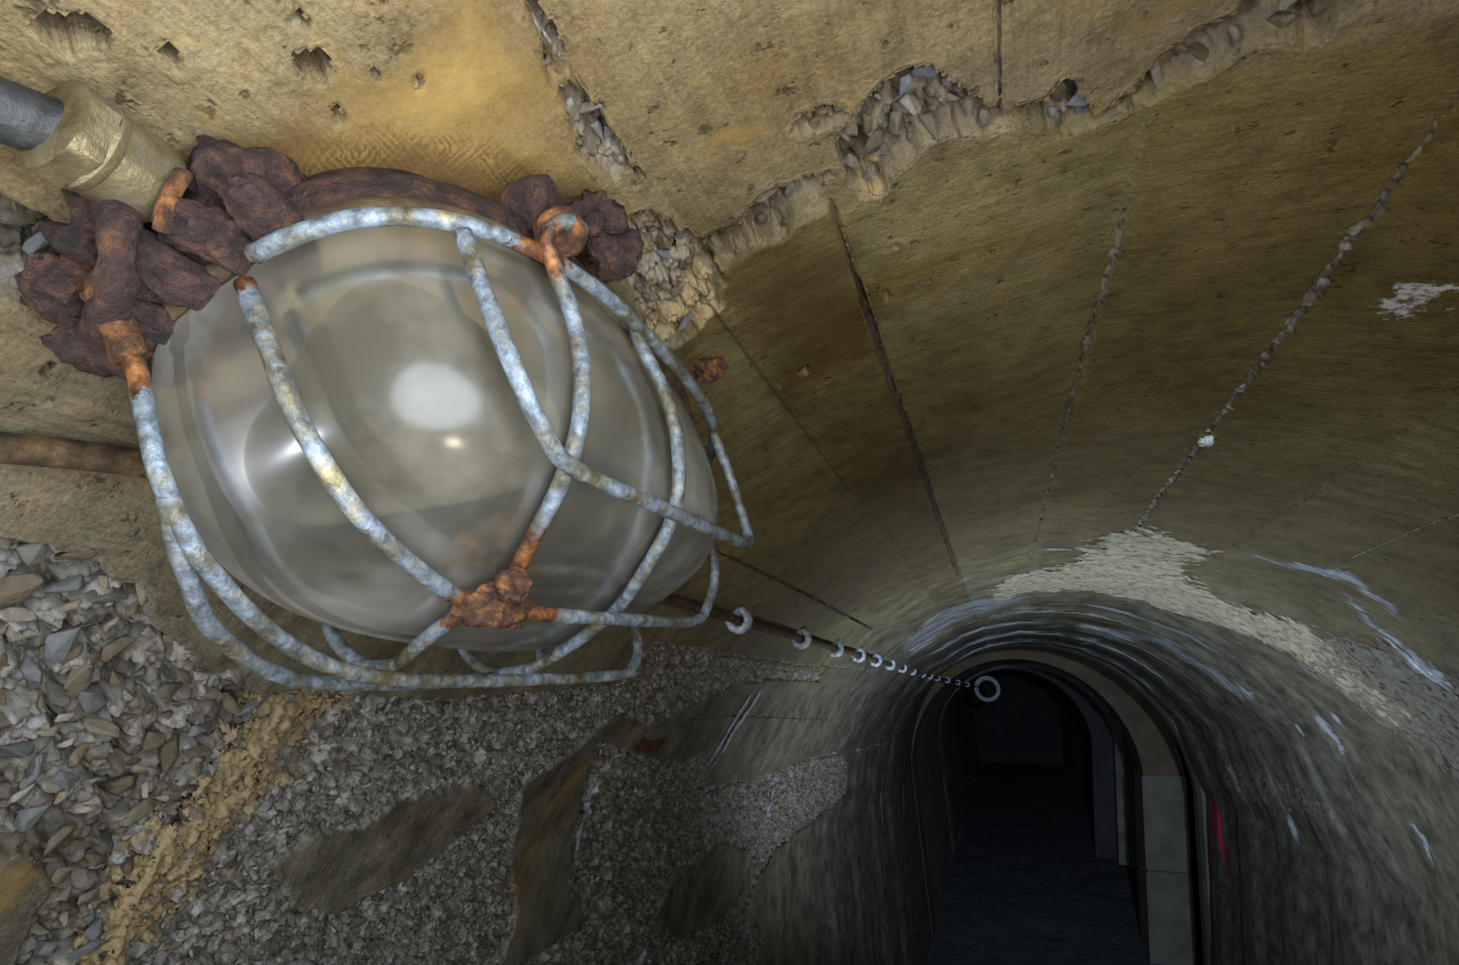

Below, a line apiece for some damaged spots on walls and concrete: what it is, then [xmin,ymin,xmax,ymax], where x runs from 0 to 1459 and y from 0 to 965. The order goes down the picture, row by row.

crack [499,0,651,185]
spalling [506,0,1391,353]
crack [1127,83,1459,535]
leakage [1377,283,1459,320]
leakage [904,576,1256,703]
leakage [1255,555,1457,698]
leakage [1295,712,1345,755]
leakage [1287,813,1299,843]
leakage [1412,823,1434,863]